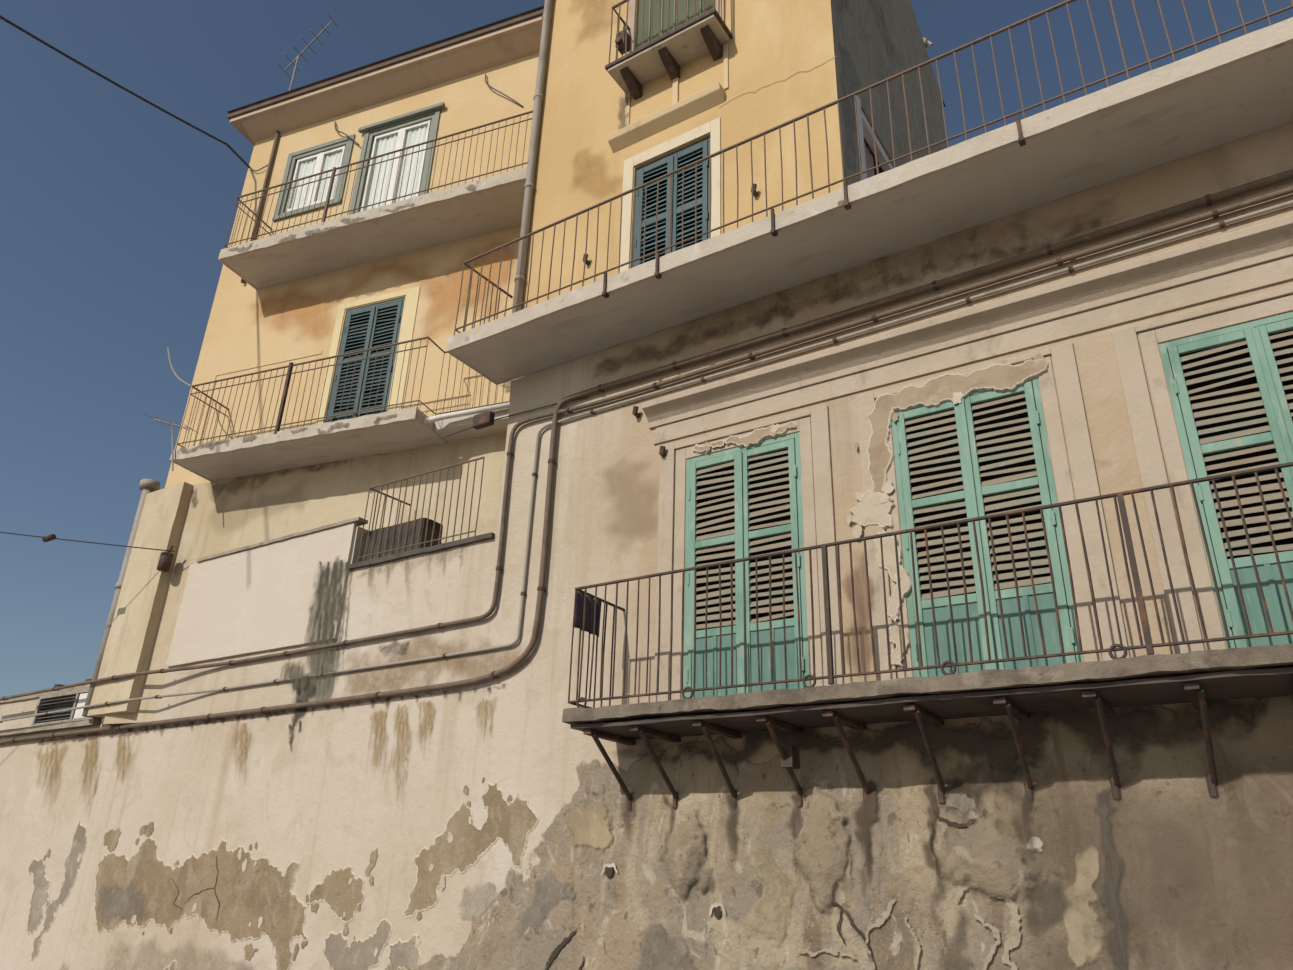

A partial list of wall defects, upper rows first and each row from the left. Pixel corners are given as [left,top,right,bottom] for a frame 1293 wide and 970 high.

crack [719,56,837,108]
leakage [262,294,331,333]
leakage [426,248,510,315]
flaking render [693,421,797,454]
flaking render [847,354,1049,668]
flaking render [26,695,1293,970]
leakage [640,699,1293,970]
crack [831,902,874,962]